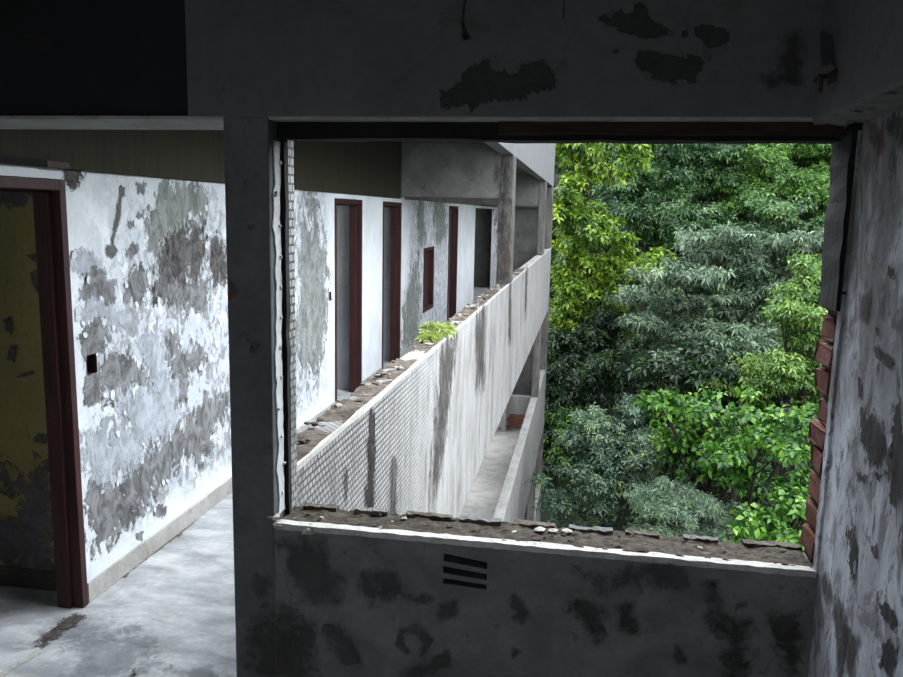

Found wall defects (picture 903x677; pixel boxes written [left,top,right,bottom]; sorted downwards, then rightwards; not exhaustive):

peeling [439,58,556,116]
peeling [598,2,736,88]
flaking render [62,169,85,192]
peeling [69,178,231,560]
damp [429,322,457,500]
damp [474,301,487,391]
damp [859,288,871,323]
damp [364,407,377,508]
damp [390,456,398,513]
damp [276,535,345,606]
damp [395,623,451,677]
damp [817,572,861,677]